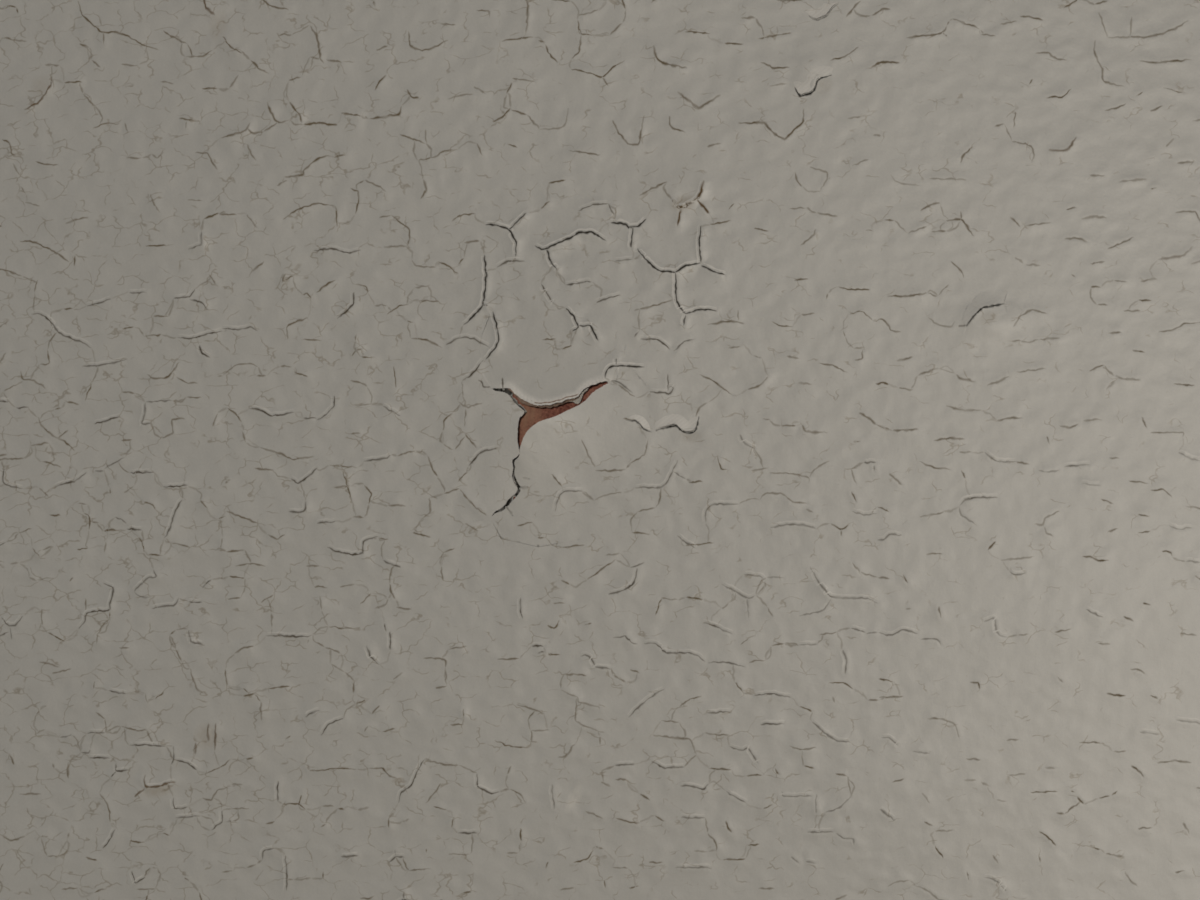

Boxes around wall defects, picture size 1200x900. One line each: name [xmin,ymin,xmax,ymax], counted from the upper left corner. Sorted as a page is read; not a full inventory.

crack [0,5,27,43]
crack [24,0,805,200]
crack [830,0,1192,112]
crack [2,139,58,207]
crack [789,116,974,246]
crack [1010,119,1200,390]
peeling [454,344,705,547]
crack [0,179,1200,893]
crack [887,880,944,900]